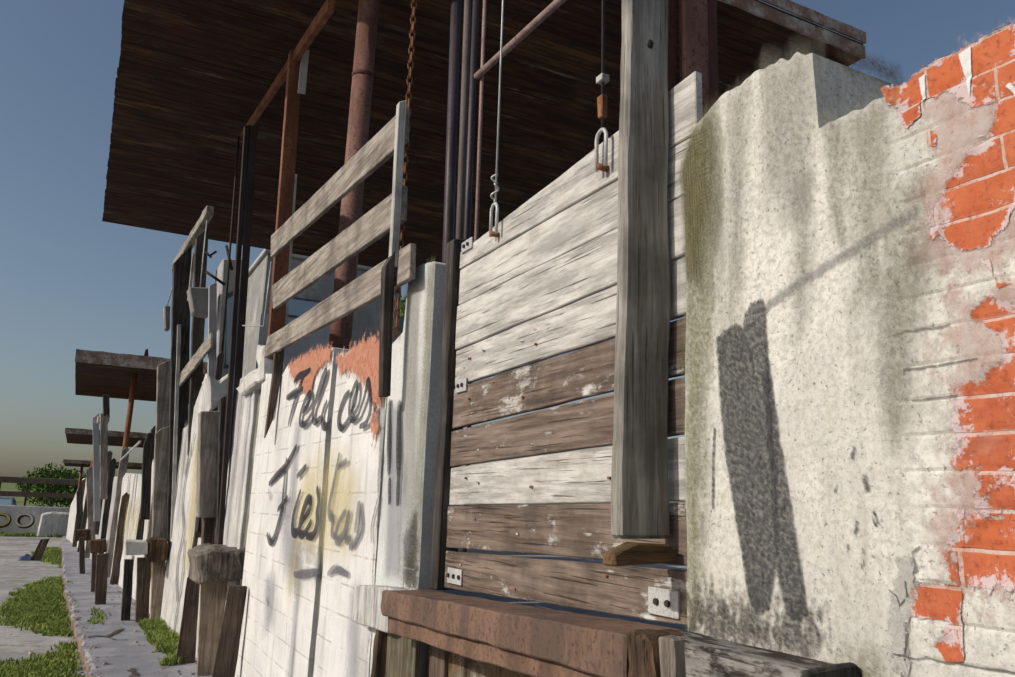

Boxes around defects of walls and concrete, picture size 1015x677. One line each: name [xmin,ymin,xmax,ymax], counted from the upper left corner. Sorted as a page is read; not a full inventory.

peeling [880,23,1015,677]
water stain [448,652,534,677]
crack [889,546,1015,677]